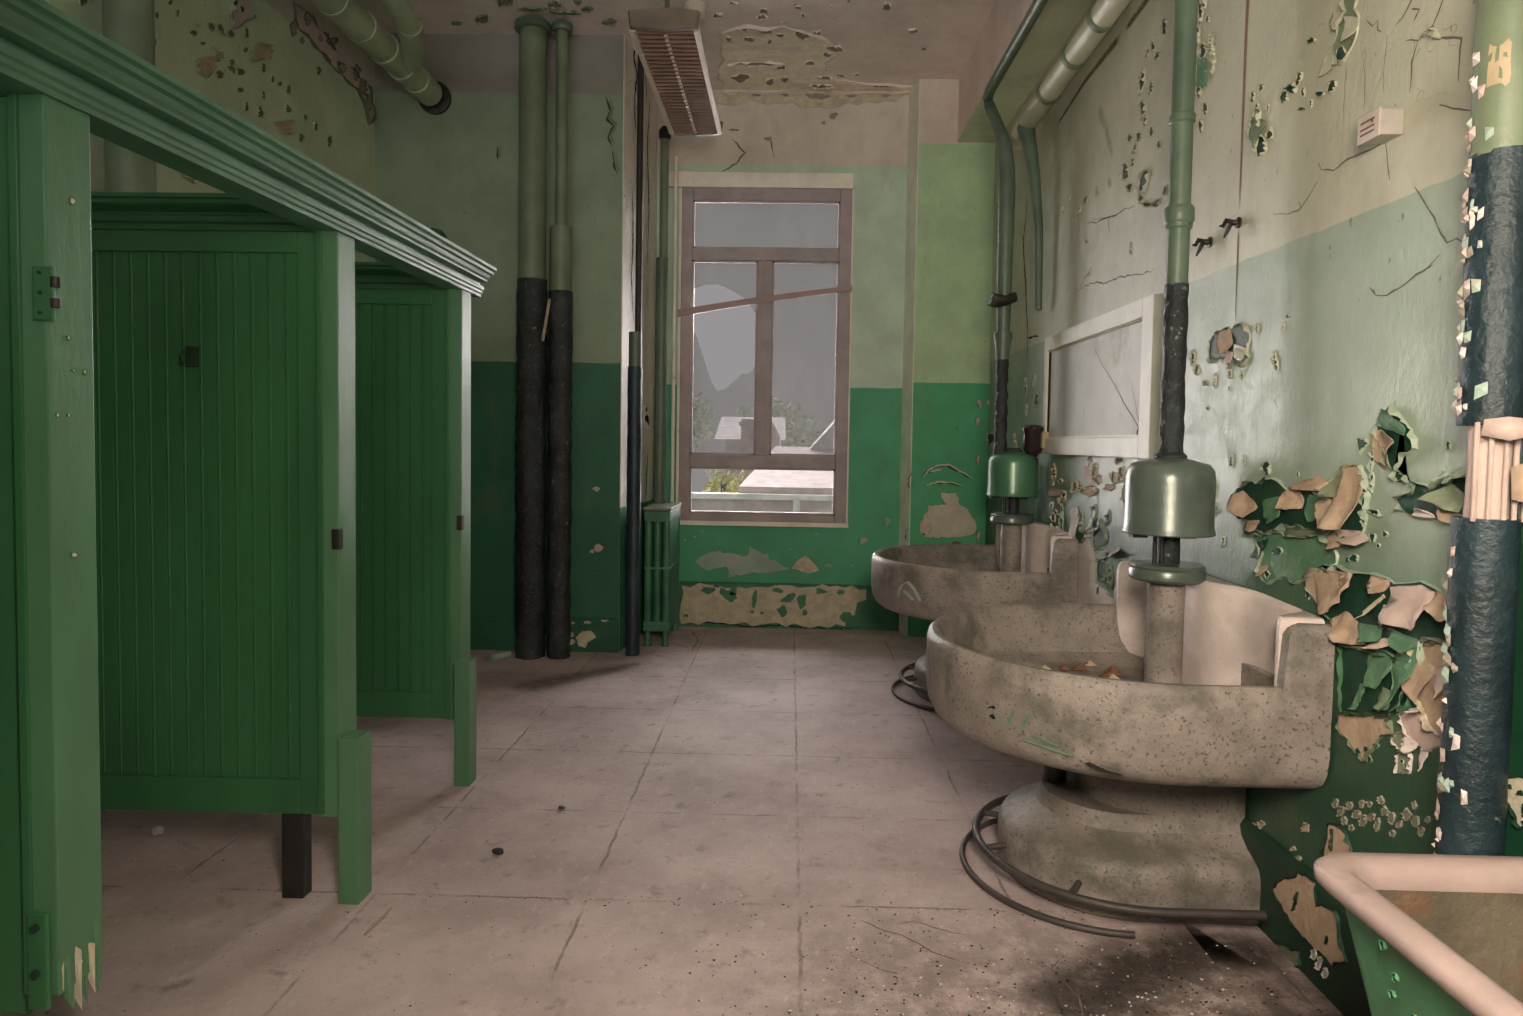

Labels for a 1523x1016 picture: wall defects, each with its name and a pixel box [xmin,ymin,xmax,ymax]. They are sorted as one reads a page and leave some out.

peeling [713,1,914,125]
peeling [1061,18,1169,224]
peeling [1246,0,1360,158]
crack [1344,0,1471,111]
peeling [1486,38,1512,87]
crack [1279,143,1462,296]
peeling [1189,323,1260,391]
peeling [884,492,981,544]
spalling [679,546,866,628]
peeling [1215,405,1466,774]
peeling [1507,776,1523,830]
spalling [1271,795,1431,979]